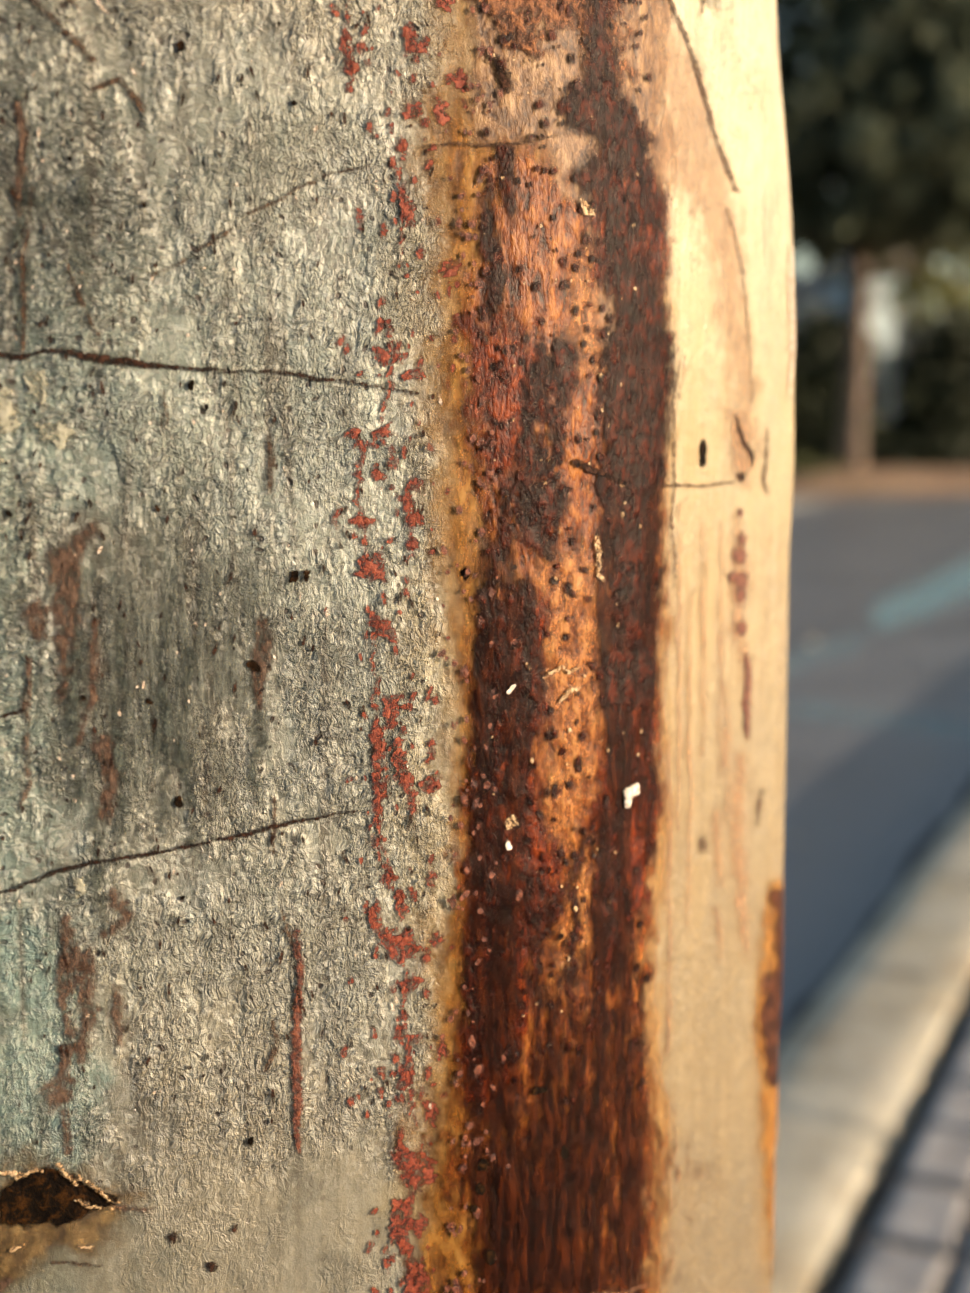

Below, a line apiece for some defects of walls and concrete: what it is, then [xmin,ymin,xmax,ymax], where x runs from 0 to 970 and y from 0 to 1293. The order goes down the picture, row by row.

crack [0,187,419,424]
peeling [381,136,417,268]
peeling [344,341,427,583]
leakage [25,601,49,640]
leakage [154,612,195,849]
crack [0,797,358,894]
leakage [248,641,268,803]
peeling [366,605,445,1129]
rust [421,0,685,1293]
rust [729,508,753,740]
rust [754,880,783,1275]
peeling [388,1146,439,1293]